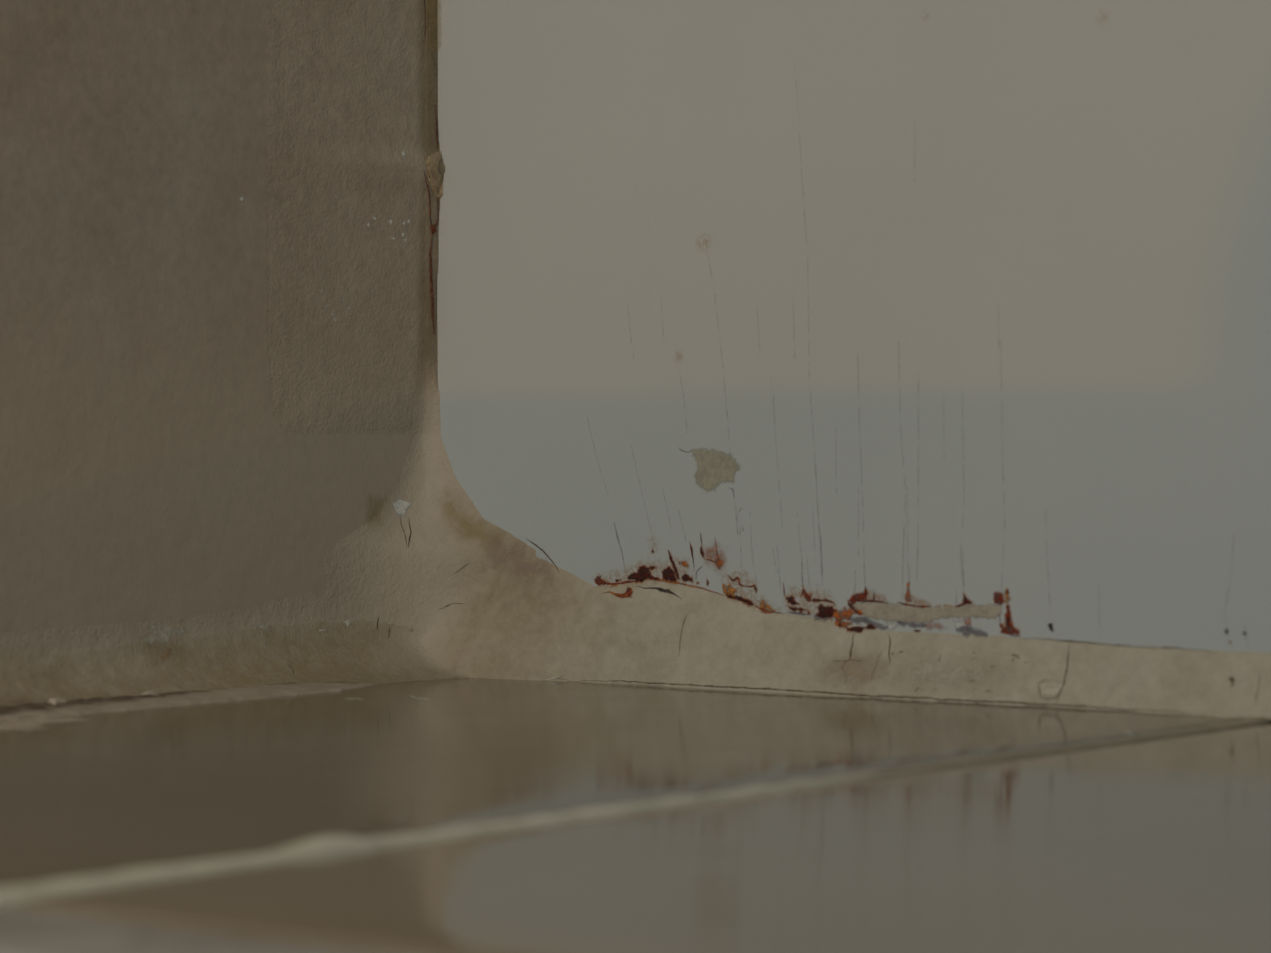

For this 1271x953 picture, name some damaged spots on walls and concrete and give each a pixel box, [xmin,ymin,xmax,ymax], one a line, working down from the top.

peeling [679,448,739,497]
rust [594,533,973,633]
peeling [853,602,1001,636]
rust [993,589,1021,637]